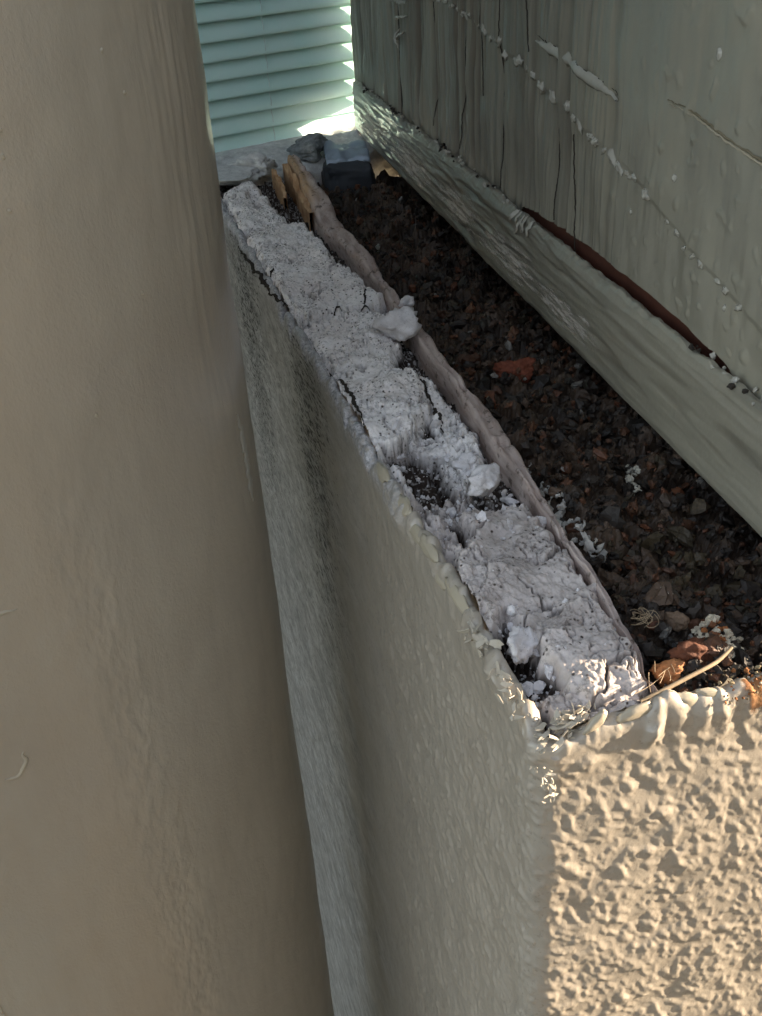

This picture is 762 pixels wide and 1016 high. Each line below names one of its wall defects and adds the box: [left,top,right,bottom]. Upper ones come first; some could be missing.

crack [396,11,404,109]
crack [459,0,505,149]
crack [523,0,531,52]
peeling [358,105,596,346]
crack [498,120,506,188]
crack [553,134,576,251]
crack [667,99,762,166]
peeling [457,610,596,755]
peeling [529,767,559,804]